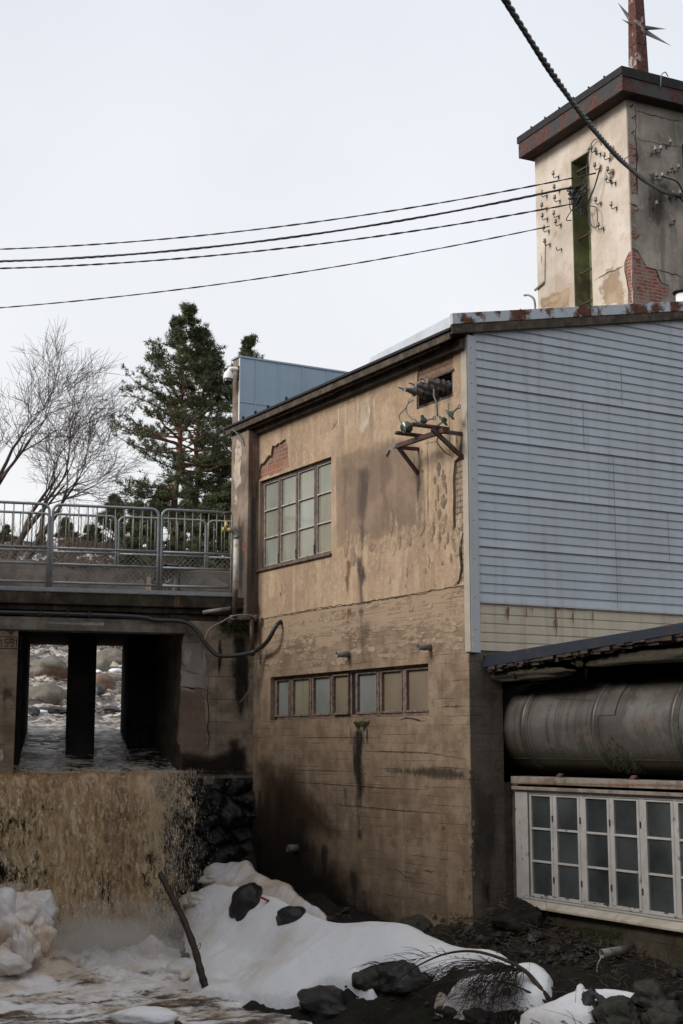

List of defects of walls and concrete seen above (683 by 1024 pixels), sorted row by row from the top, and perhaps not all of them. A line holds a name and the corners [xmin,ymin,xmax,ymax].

spalling [624,143,669,304]
spalling [233,431,294,505]
peeling [254,459,473,671]
damp [337,443,423,543]
damp [345,729,368,801]
damp [251,767,378,919]